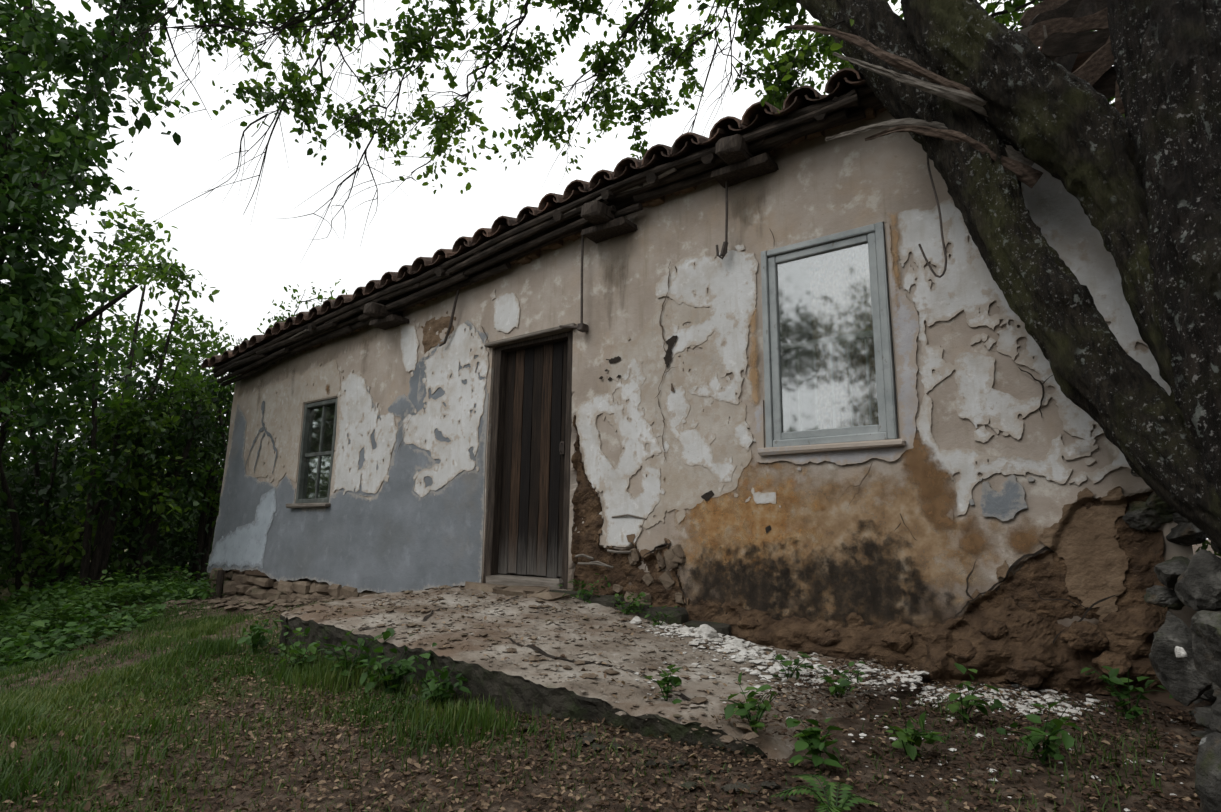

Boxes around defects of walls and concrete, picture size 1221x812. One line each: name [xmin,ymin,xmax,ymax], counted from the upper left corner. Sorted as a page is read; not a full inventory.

flaking render [207,289,521,593]
crack [656,261,678,461]
flaking render [571,244,781,608]
damp [676,434,999,627]
flaking render [897,198,1168,643]
crack [1018,367,1053,417]
flaking render [1021,163,1171,396]